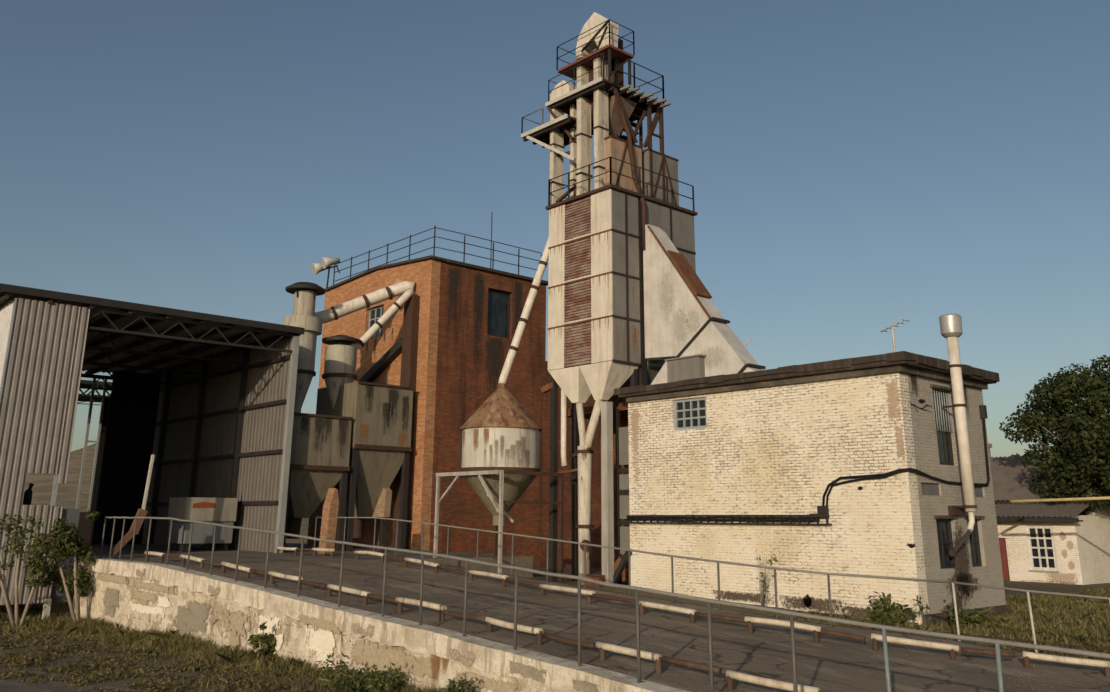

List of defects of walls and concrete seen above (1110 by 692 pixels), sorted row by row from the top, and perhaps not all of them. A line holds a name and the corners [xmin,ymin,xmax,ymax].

damp [366,385,409,430]
damp [301,417,349,457]
rust [463,429,489,447]
peeling [94,569,283,651]
peeling [296,613,439,678]
peeling [448,648,547,692]
peeling [572,678,599,692]